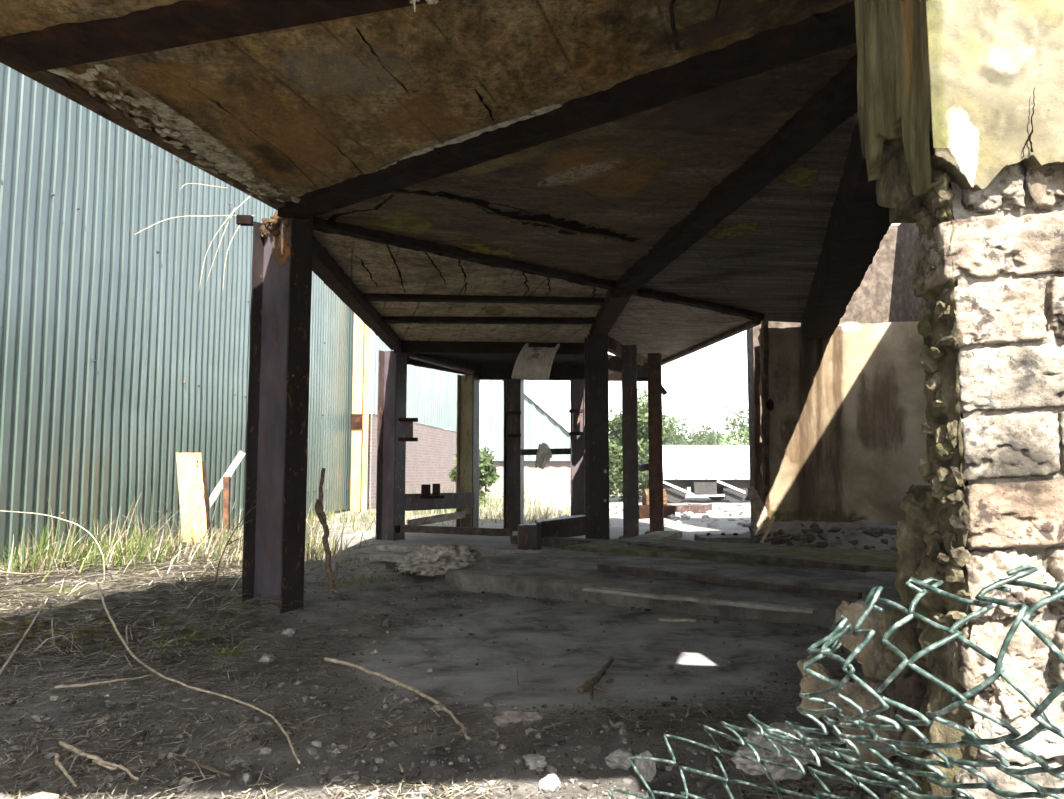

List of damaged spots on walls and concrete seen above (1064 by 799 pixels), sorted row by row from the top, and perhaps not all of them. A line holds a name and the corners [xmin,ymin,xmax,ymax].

crack [669,0,680,50]
crack [356,28,409,93]
crack [473,89,494,120]
peeling [945,110,979,187]
crack [1022,87,1035,159]
spalling [1028,171,1046,202]
crack [328,189,643,244]
crack [355,244,405,293]
crack [424,252,468,294]
water stain [775,322,860,522]
water stain [857,369,904,450]